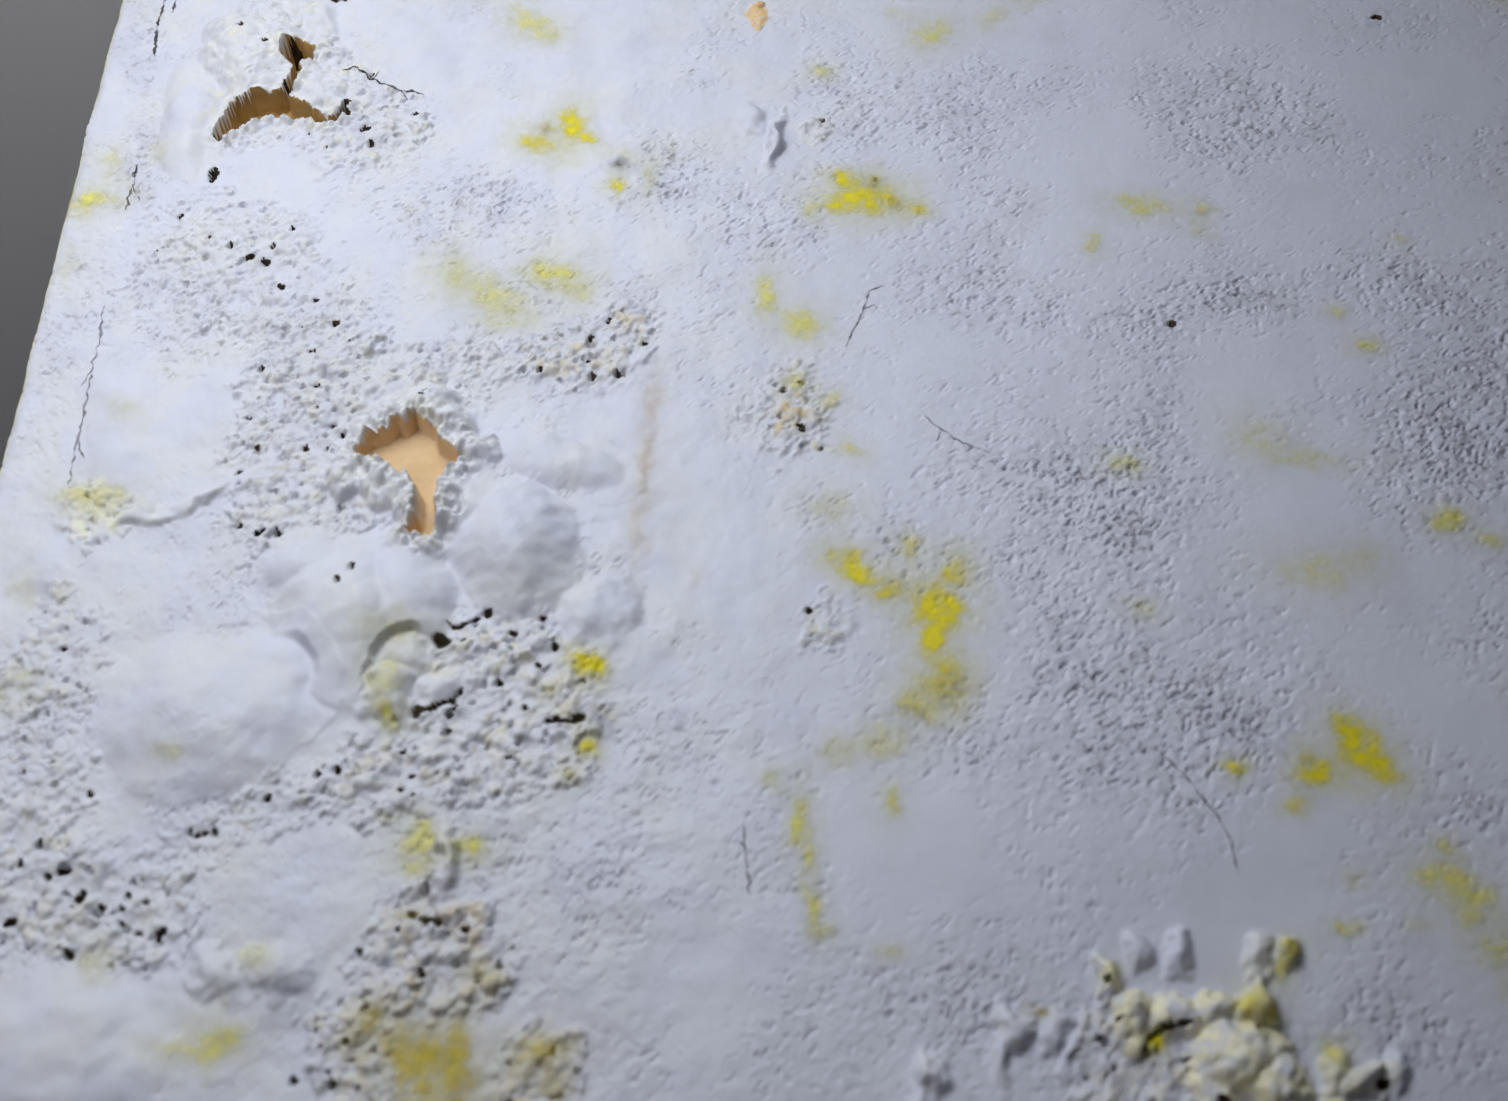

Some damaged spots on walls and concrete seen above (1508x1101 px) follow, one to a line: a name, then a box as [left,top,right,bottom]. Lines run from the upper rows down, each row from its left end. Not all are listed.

peeling [132,0,668,563]
mould [829,550,965,716]
mould [1225,761,1247,774]
mould [1298,713,1399,785]
damp [1239,990,1279,1020]
mould [363,1009,475,1101]
damp [524,1041,557,1060]
damp [1148,1035,1165,1050]